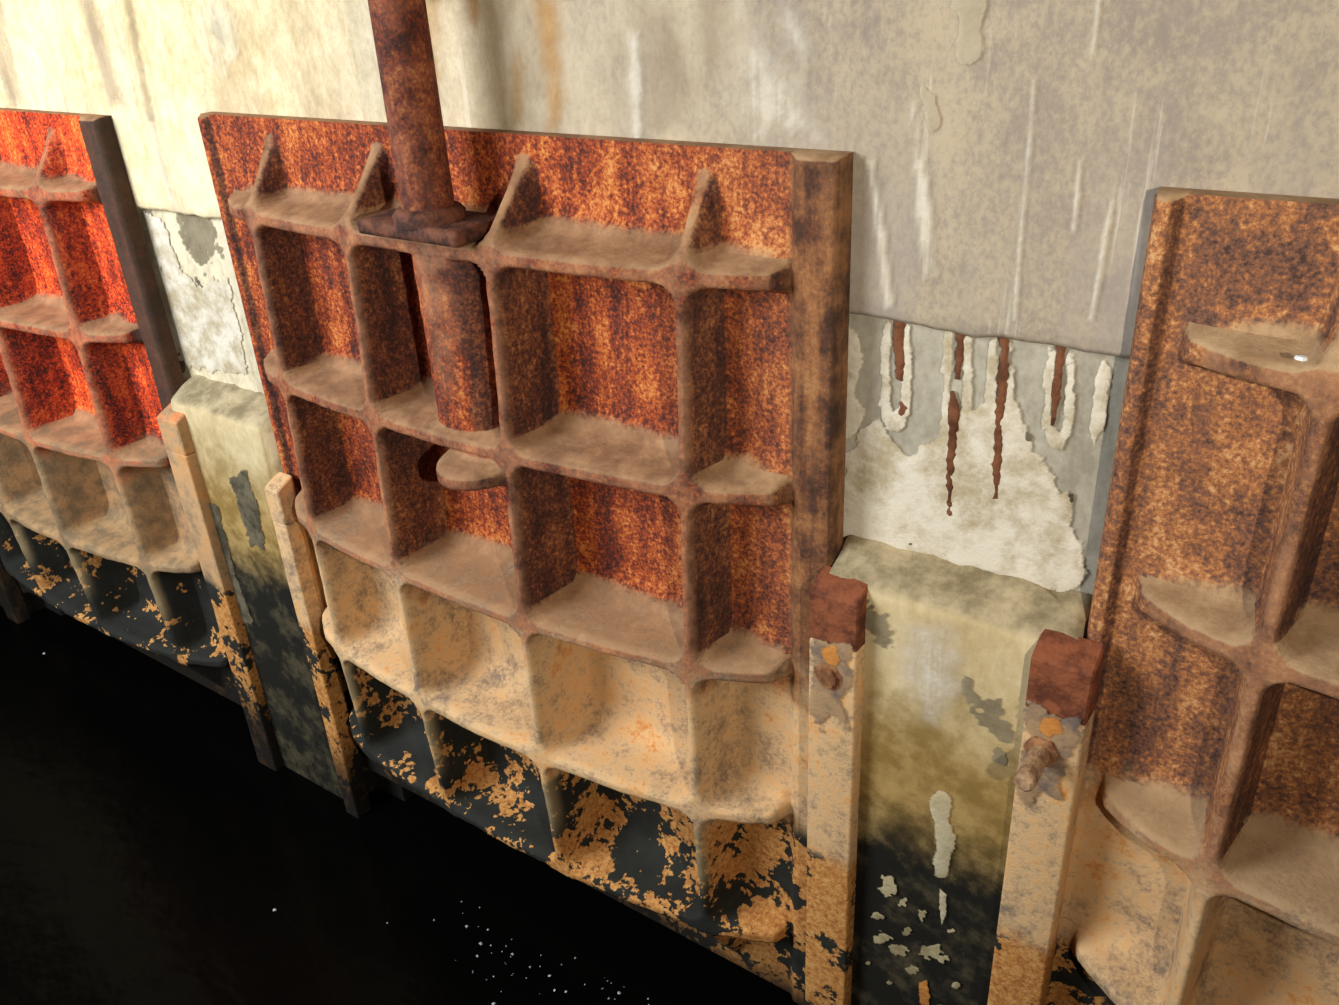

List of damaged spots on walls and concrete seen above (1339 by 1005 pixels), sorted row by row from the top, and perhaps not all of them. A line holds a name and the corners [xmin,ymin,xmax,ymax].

rust [893,321,906,381]
rust [945,333,965,516]
rust [991,337,1010,499]
rust [1051,345,1066,426]
rust [821,646,841,666]
damp [865,600,893,648]
damp [908,631,1014,766]
damp [930,791,956,923]